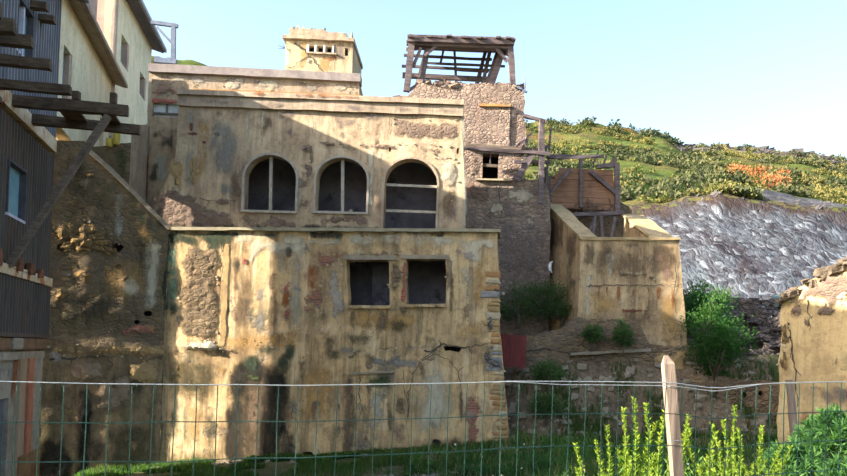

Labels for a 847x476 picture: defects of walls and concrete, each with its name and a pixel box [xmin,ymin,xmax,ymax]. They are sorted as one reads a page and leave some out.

crack [287,43,337,72]
flaking render [152,158,232,227]
flaking render [392,115,460,202]
flaking render [175,245,221,343]
leakage [551,219,576,267]
leakage [585,244,675,274]
crack [587,255,681,317]
flaking render [784,269,847,327]
crack [787,300,814,407]
leakage [226,399,236,435]
leakage [247,387,287,456]
crack [402,341,488,444]